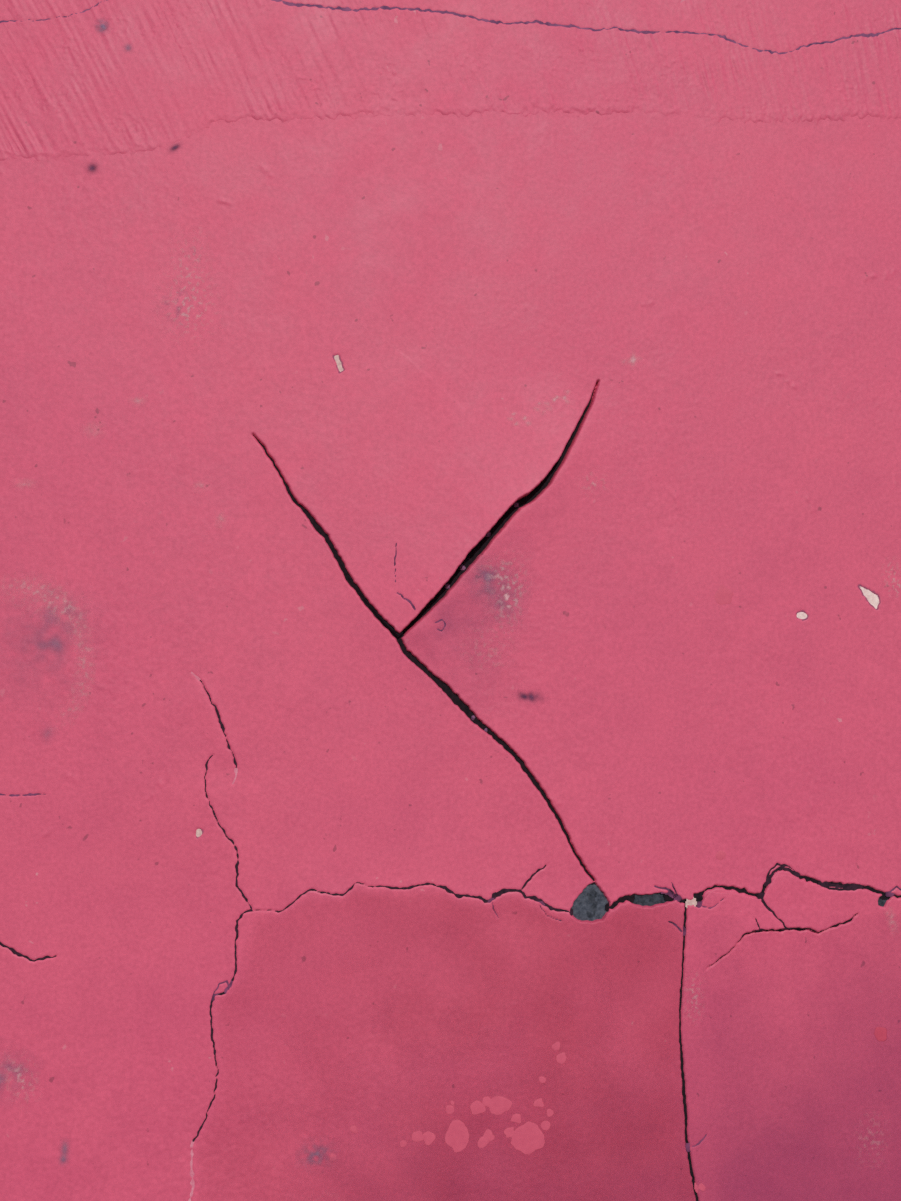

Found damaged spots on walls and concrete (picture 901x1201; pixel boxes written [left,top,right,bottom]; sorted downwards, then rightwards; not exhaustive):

crack [0,0,107,23]
crack [272,0,901,54]
peeling [858,584,881,610]
crack [253,390,901,1201]
crack [0,942,56,962]
crack [188,672,573,1201]